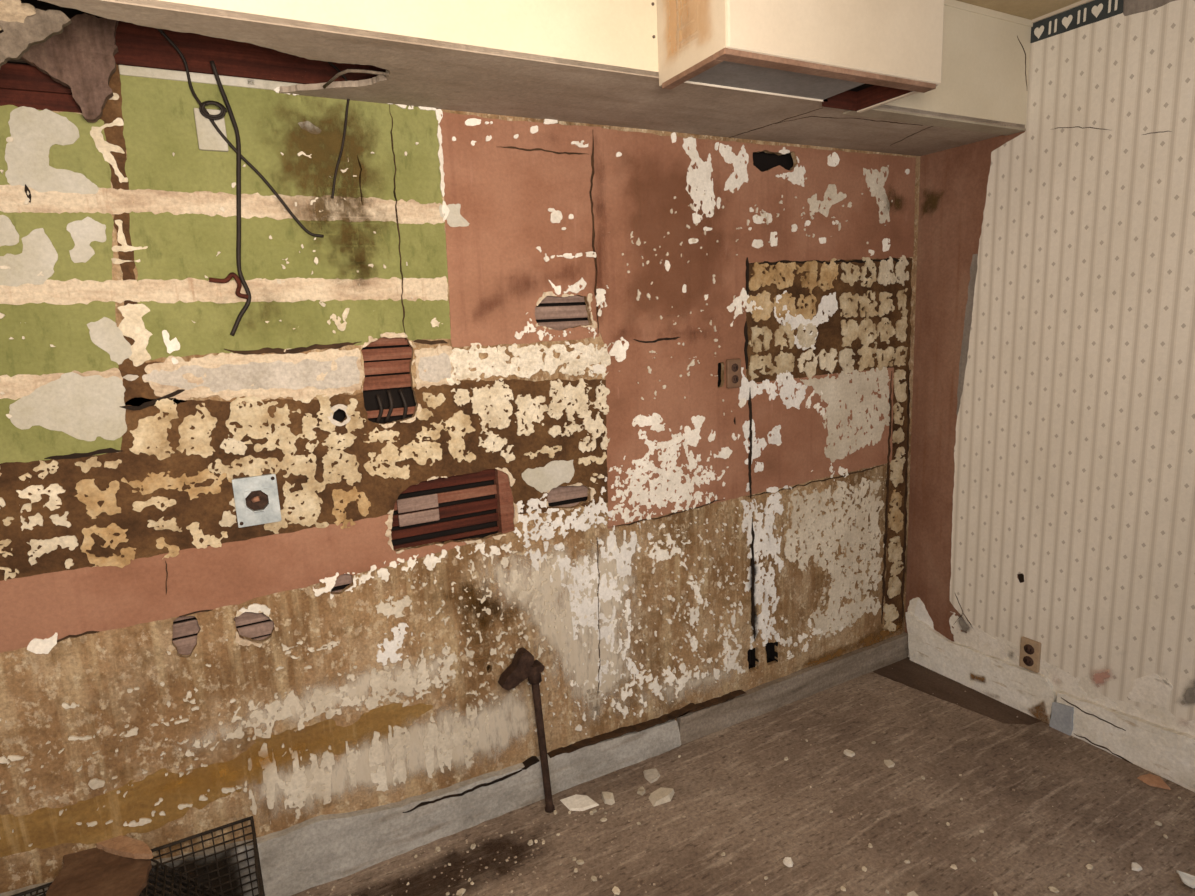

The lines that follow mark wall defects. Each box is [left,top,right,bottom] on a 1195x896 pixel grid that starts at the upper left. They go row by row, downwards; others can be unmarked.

peeling [465,118,493,146]
peeling [513,119,558,139]
damp [283,115,376,278]
peeling [548,208,574,230]
peeling [536,246,596,262]
peeling [622,132,893,273]
spalling [514,277,609,345]
peeling [660,274,838,357]
peeling [0,330,890,827]
peeling [908,597,934,629]
damp [256,694,528,808]
crack [403,690,746,813]